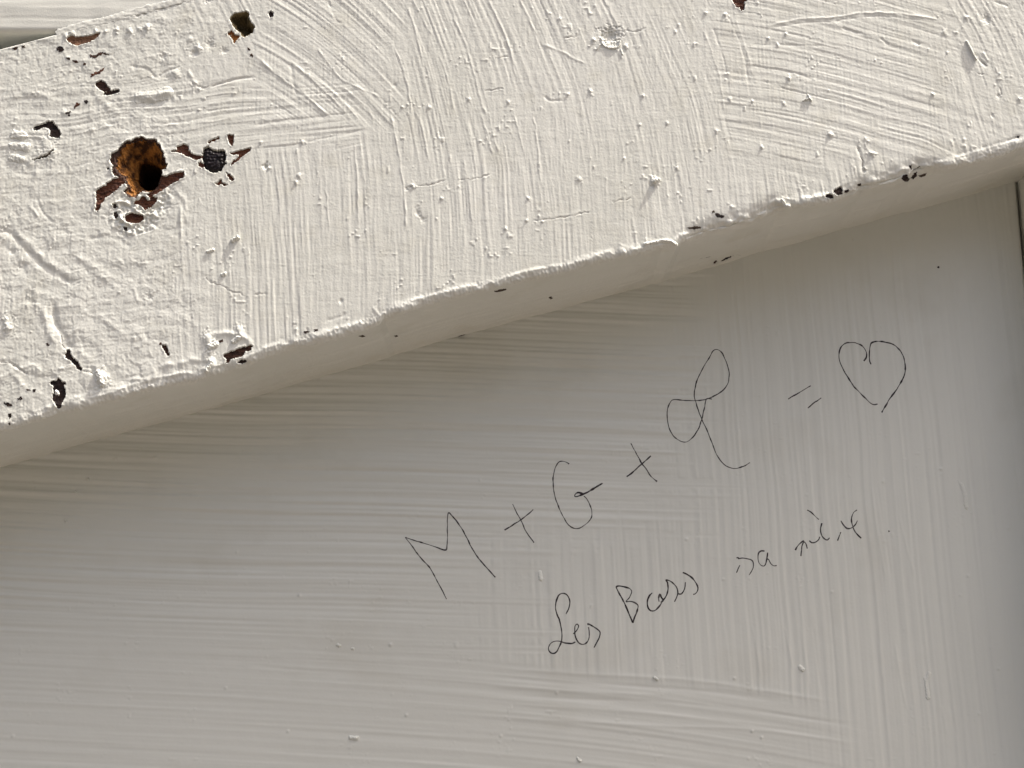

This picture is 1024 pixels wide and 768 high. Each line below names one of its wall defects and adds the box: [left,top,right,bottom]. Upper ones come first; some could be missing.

peeling [56,33,119,96]
peeling [33,121,61,161]
peeling [171,144,205,168]
peeling [208,134,251,186]
peeling [112,195,157,231]
peeling [219,339,253,364]
peeling [50,378,66,409]